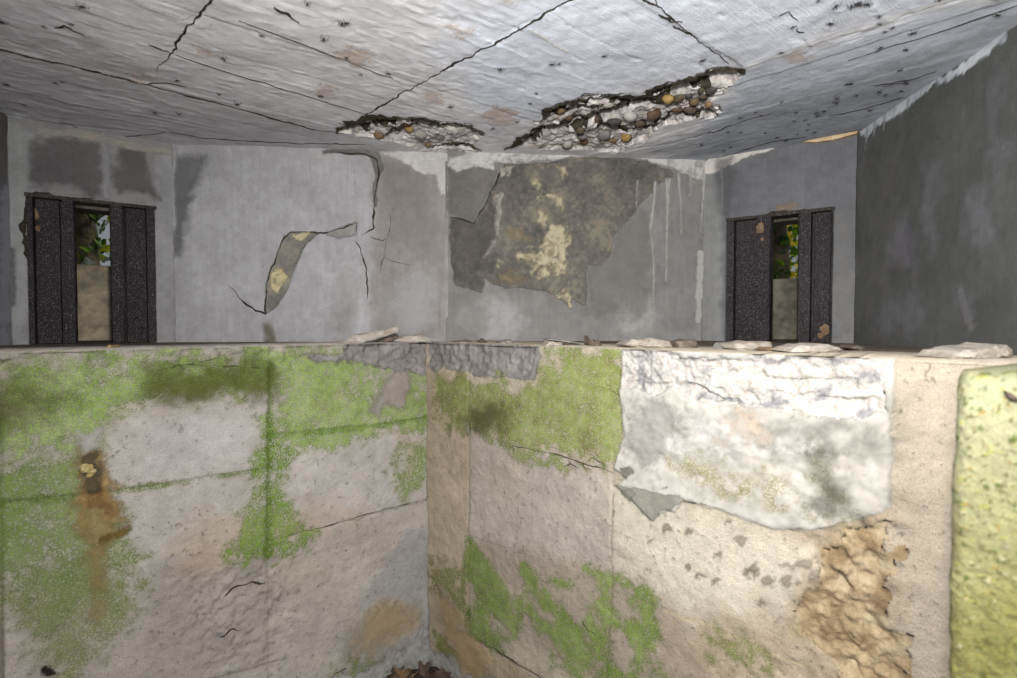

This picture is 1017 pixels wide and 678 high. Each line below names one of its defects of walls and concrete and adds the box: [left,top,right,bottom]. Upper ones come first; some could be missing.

crack [642,0,729,64]
crack [848,5,1017,61]
crack [0,0,573,145]
spalling [336,114,485,153]
spalling [504,67,746,154]
crack [831,71,936,116]
leakage [227,148,774,342]
leakage [146,361,278,402]
spalling [621,350,889,420]
leakage [78,428,102,452]
rust [73,448,132,620]
spalling [744,560,821,587]